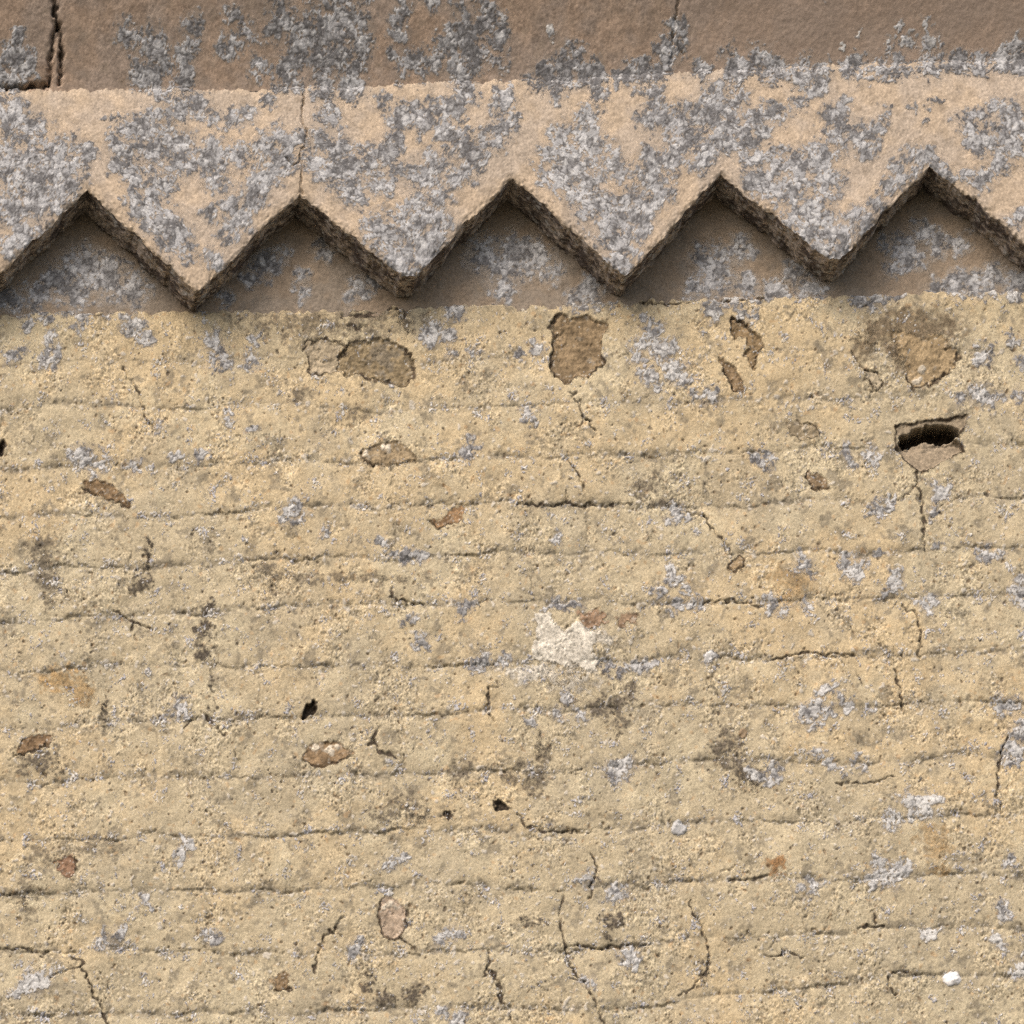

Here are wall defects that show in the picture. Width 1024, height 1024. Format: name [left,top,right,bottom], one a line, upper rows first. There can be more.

spalling [301,336,416,387]
spalling [547,313,608,385]
spalling [719,316,765,393]
spalling [891,330,961,392]
spalling [894,414,966,473]
spalling [81,479,131,508]
crack [902,471,926,551]
spalling [302,741,354,768]
crack [995,736,1011,805]
crack [6,947,108,1024]
crack [559,897,643,1024]
crack [679,900,710,996]